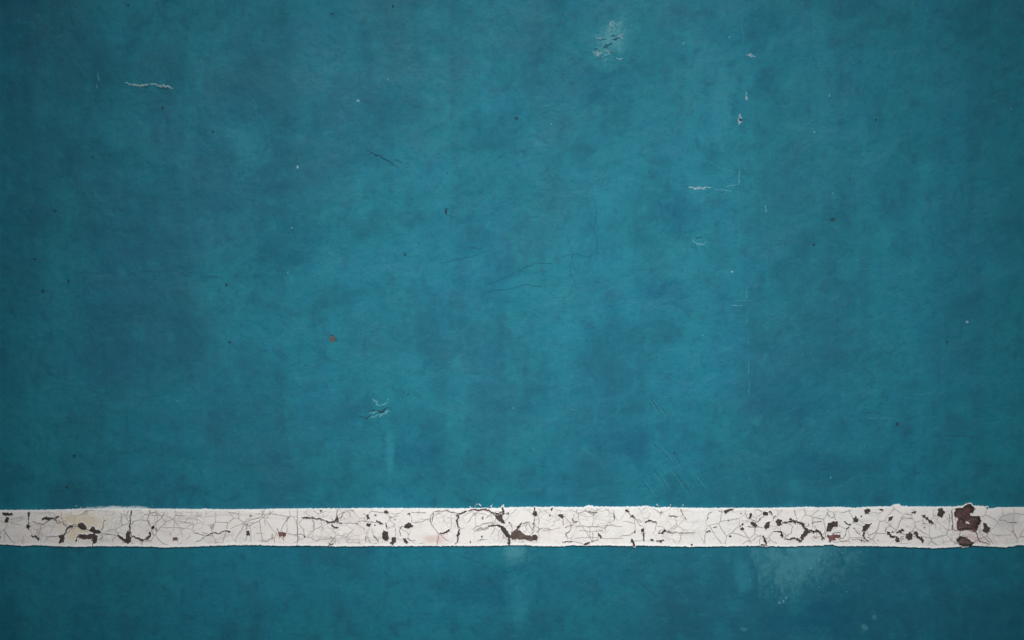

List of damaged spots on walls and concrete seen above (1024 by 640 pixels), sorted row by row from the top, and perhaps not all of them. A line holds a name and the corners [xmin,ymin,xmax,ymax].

peeling [586,1,637,73]
spalling [0,511,23,540]
spalling [41,515,106,547]
crack [26,509,365,545]
spalling [358,509,429,546]
spalling [470,506,578,545]
crack [430,505,717,548]
crack [748,510,826,547]
crack [853,508,905,543]
crack [951,510,1018,544]
spalling [769,503,991,604]